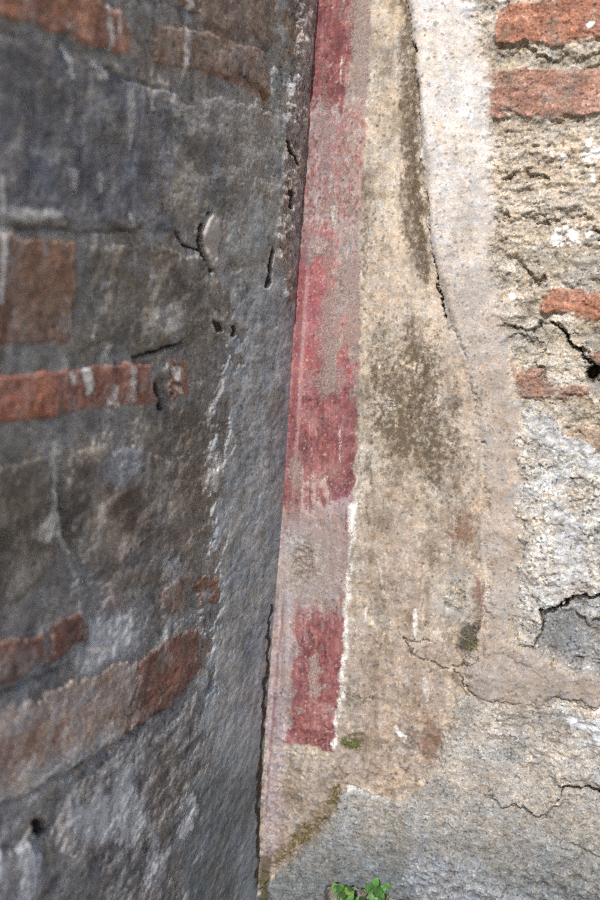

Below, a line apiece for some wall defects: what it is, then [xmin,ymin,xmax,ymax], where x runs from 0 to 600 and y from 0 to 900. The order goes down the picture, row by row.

water stain [399,0,430,283]
crack [434,260,447,318]
crack [500,322,598,366]
spalling [534,593,600,676]
crack [403,637,479,691]